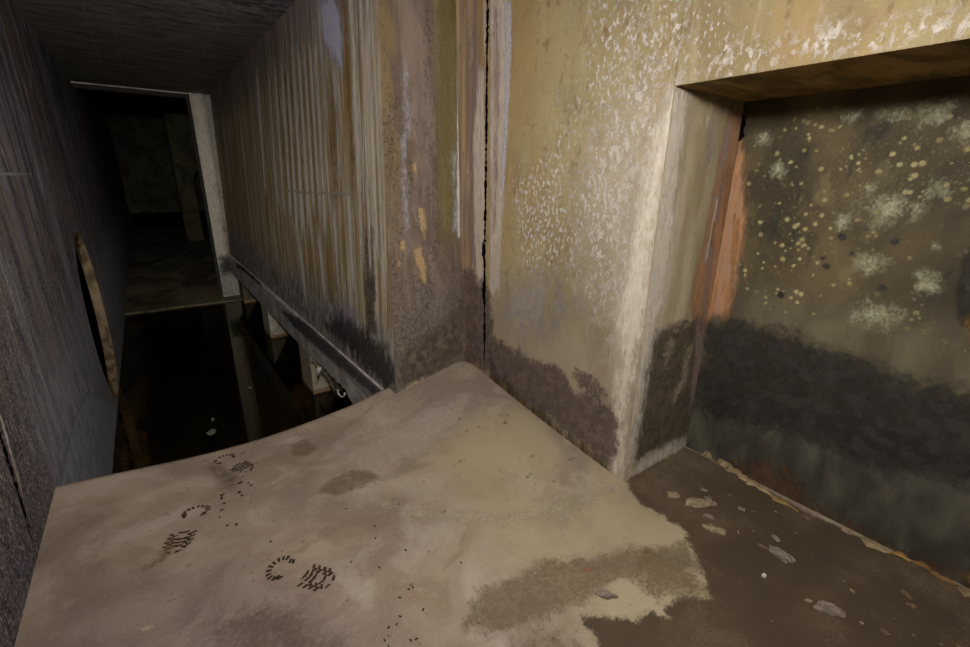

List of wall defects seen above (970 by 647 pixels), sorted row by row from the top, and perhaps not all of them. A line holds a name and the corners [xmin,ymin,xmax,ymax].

damp [189,92,261,285]
damp [255,0,619,474]
crack [481,0,489,361]
damp [483,0,775,341]
corrosion [690,107,745,408]
damp [757,189,860,276]
damp [802,112,859,156]
damp [792,22,876,54]
damp [866,136,951,237]
damp [904,14,970,37]
damp [322,471,376,494]
damp [464,317,970,647]